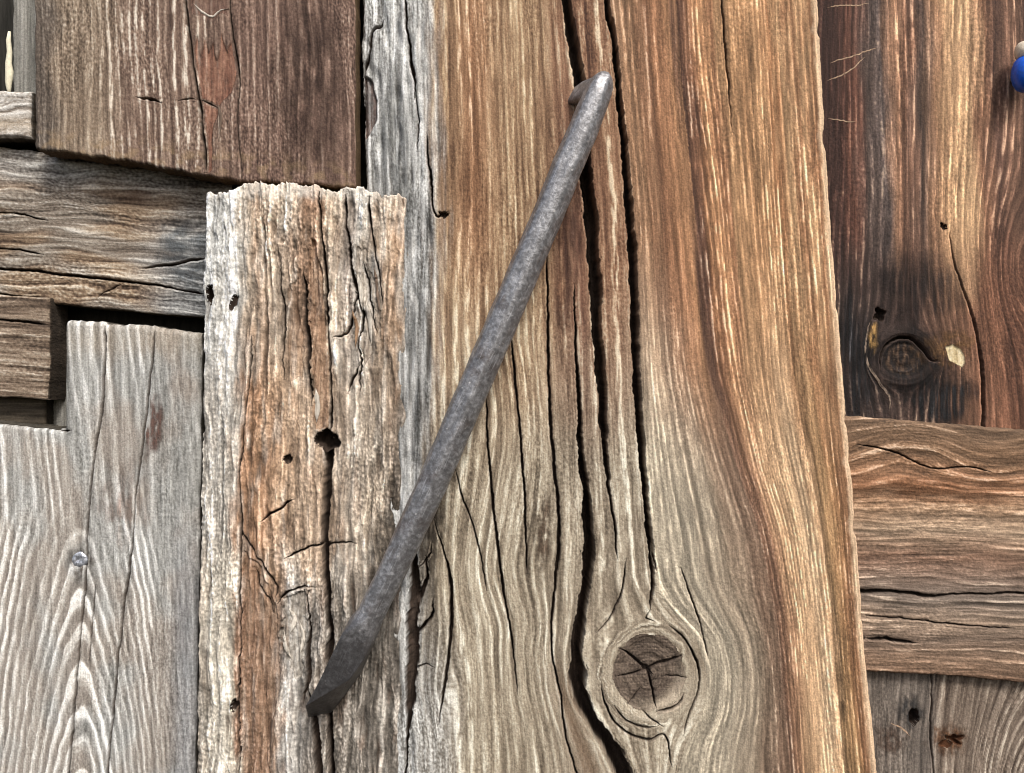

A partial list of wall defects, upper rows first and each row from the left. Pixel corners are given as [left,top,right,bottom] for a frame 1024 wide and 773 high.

crack [136,0,244,179]
crack [363,0,450,220]
crack [0,210,48,223]
crack [0,245,205,298]
crack [235,190,385,773]
crack [454,0,710,773]
crack [857,443,991,474]
crack [947,228,988,427]
crack [402,518,456,773]
crack [860,587,1024,646]